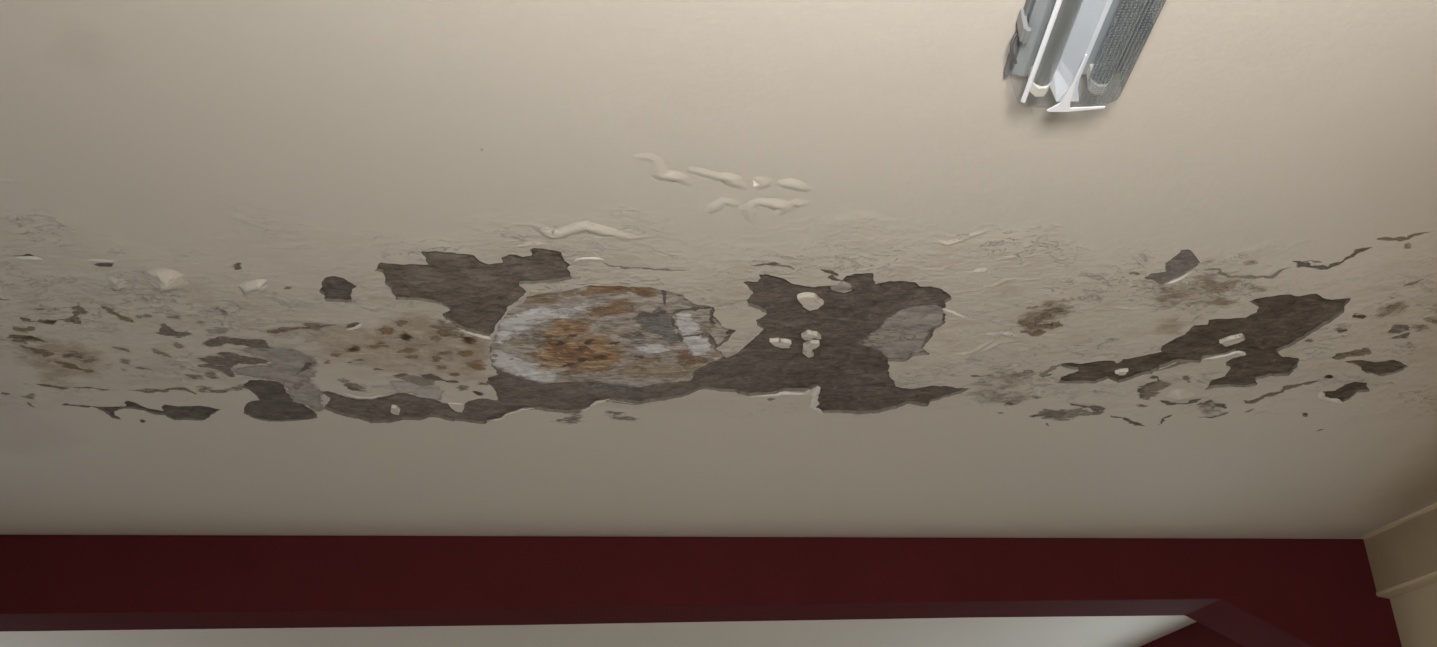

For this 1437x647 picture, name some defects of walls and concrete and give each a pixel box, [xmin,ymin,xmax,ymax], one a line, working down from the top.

spalling [1145,249,1200,285]
leakage [1158,261,1291,305]
leakage [12,336,107,391]
leakage [132,372,216,394]
rust [268,323,323,333]
rust [324,286,716,391]
spalling [92,248,970,424]
leakage [490,285,734,392]
leakage [1018,303,1067,336]
spalling [1031,294,1437,426]